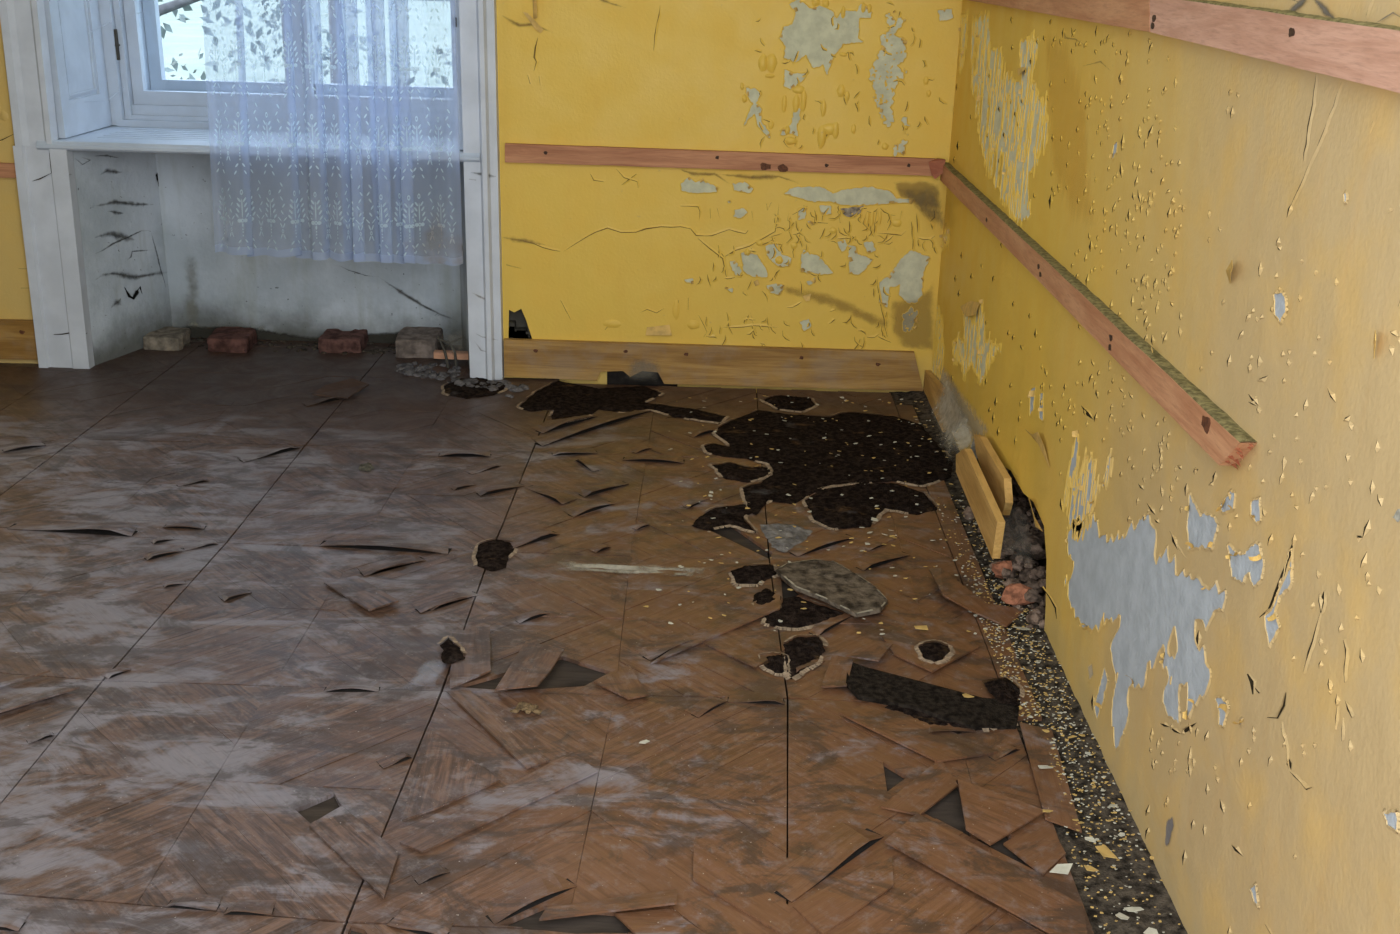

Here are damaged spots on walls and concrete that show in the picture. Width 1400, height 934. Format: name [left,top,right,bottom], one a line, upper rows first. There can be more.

peeling [743,86,801,139]
peeling [779,0,910,157]
peeling [936,7,1049,227]
peeling [680,176,754,219]
crack [523,202,939,349]
peeling [725,239,877,301]
peeling [784,185,915,226]
peeling [878,227,1002,387]
peeling [1025,386,1050,468]
peeling [1063,430,1294,751]